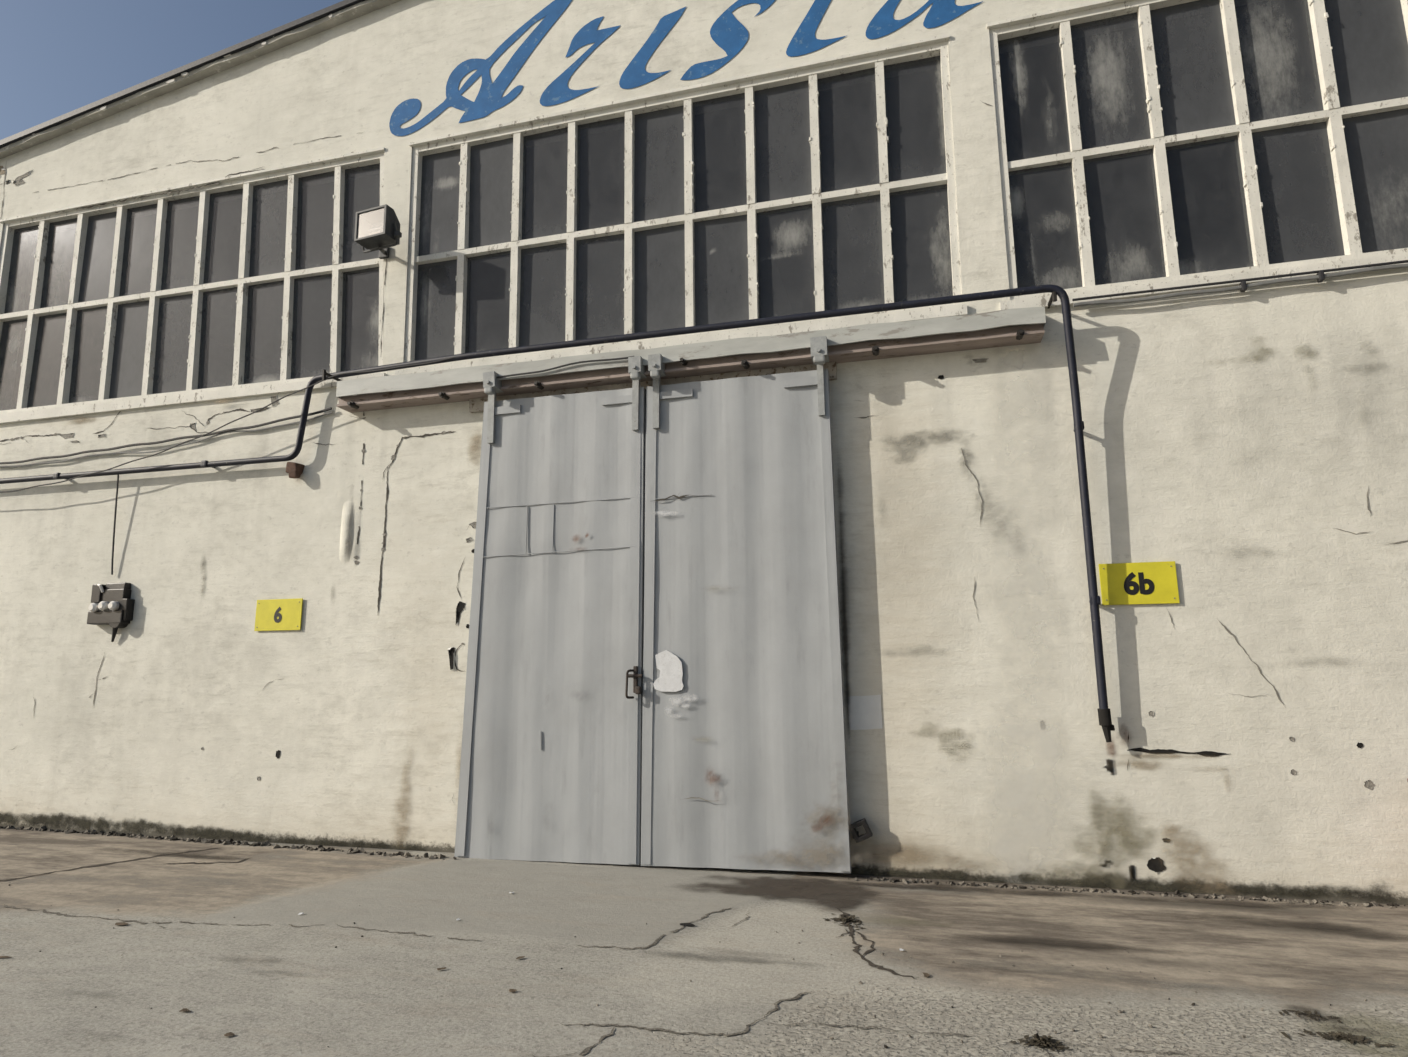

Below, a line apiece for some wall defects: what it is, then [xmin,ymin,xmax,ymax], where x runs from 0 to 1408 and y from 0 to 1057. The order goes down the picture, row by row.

damp [895,433,951,457]
crack [311,413,456,611]
crack [961,448,983,522]
crack [1218,620,1284,705]
crack [0,848,480,941]
crack [578,908,750,950]
crack [838,909,919,979]
damp [977,936,1129,949]
damp [778,812,1392,938]
crack [520,992,969,1057]
crack [1021,1038,1210,1057]